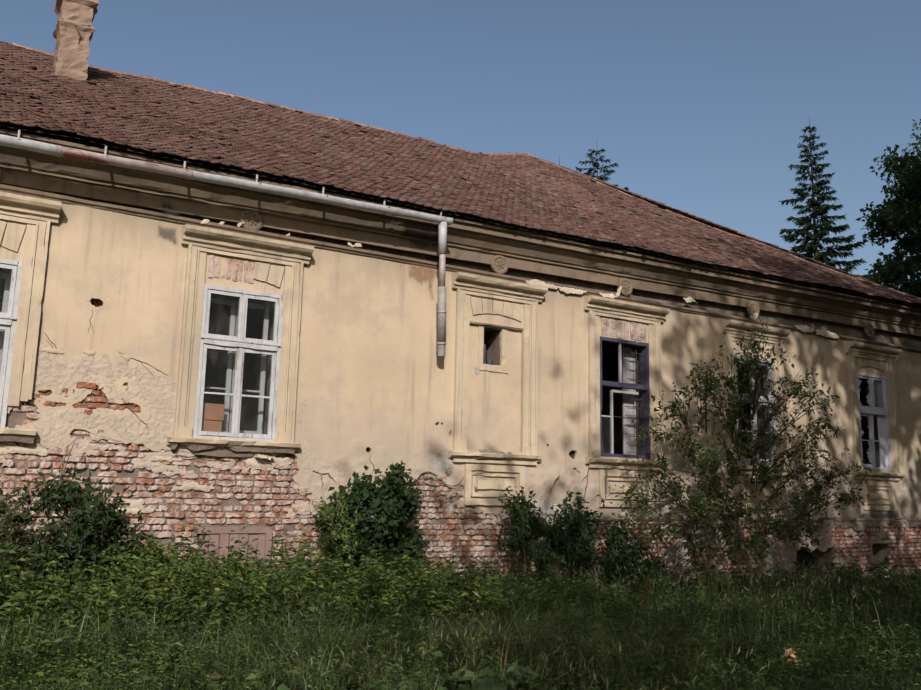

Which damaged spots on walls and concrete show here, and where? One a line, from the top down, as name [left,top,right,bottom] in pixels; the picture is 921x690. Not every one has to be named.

spalling [86,298,110,310]
peeling [0,339,386,580]
spalling [400,464,723,588]
spalling [687,521,819,584]
spalling [828,521,921,576]